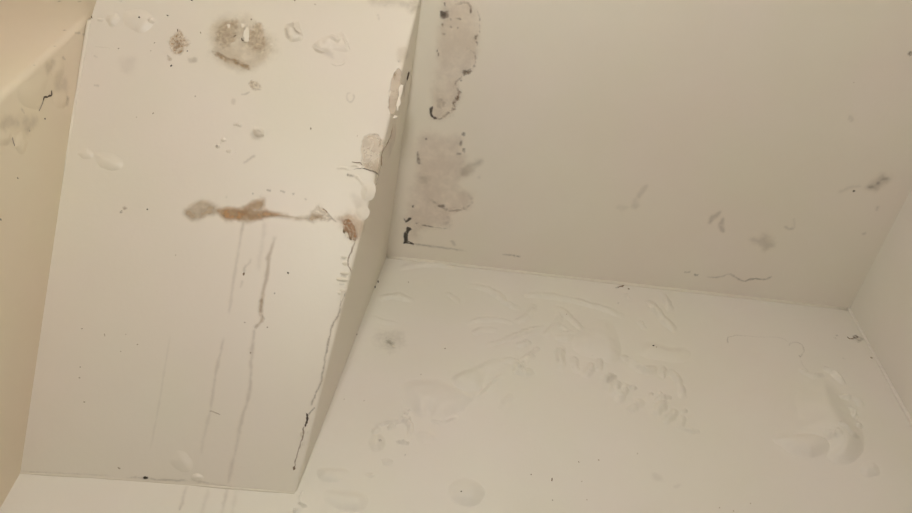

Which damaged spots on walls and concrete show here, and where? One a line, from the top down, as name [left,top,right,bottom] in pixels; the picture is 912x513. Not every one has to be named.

damp [227,19,252,42]
corrosion [224,203,270,218]
corrosion [343,219,356,240]
crack [293,413,309,470]